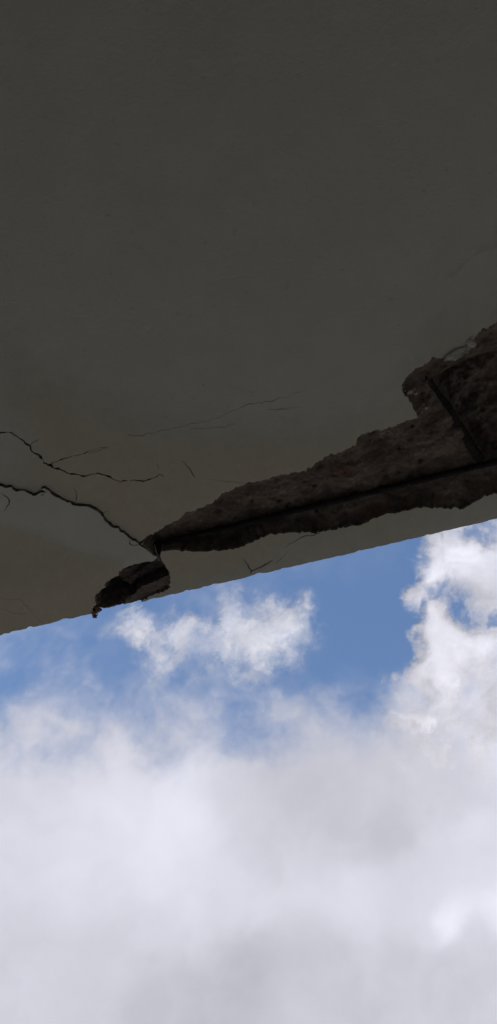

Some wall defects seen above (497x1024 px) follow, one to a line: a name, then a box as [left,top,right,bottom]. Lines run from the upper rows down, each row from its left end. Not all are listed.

crack [0,432,194,546]
spalling [91,322,497,618]